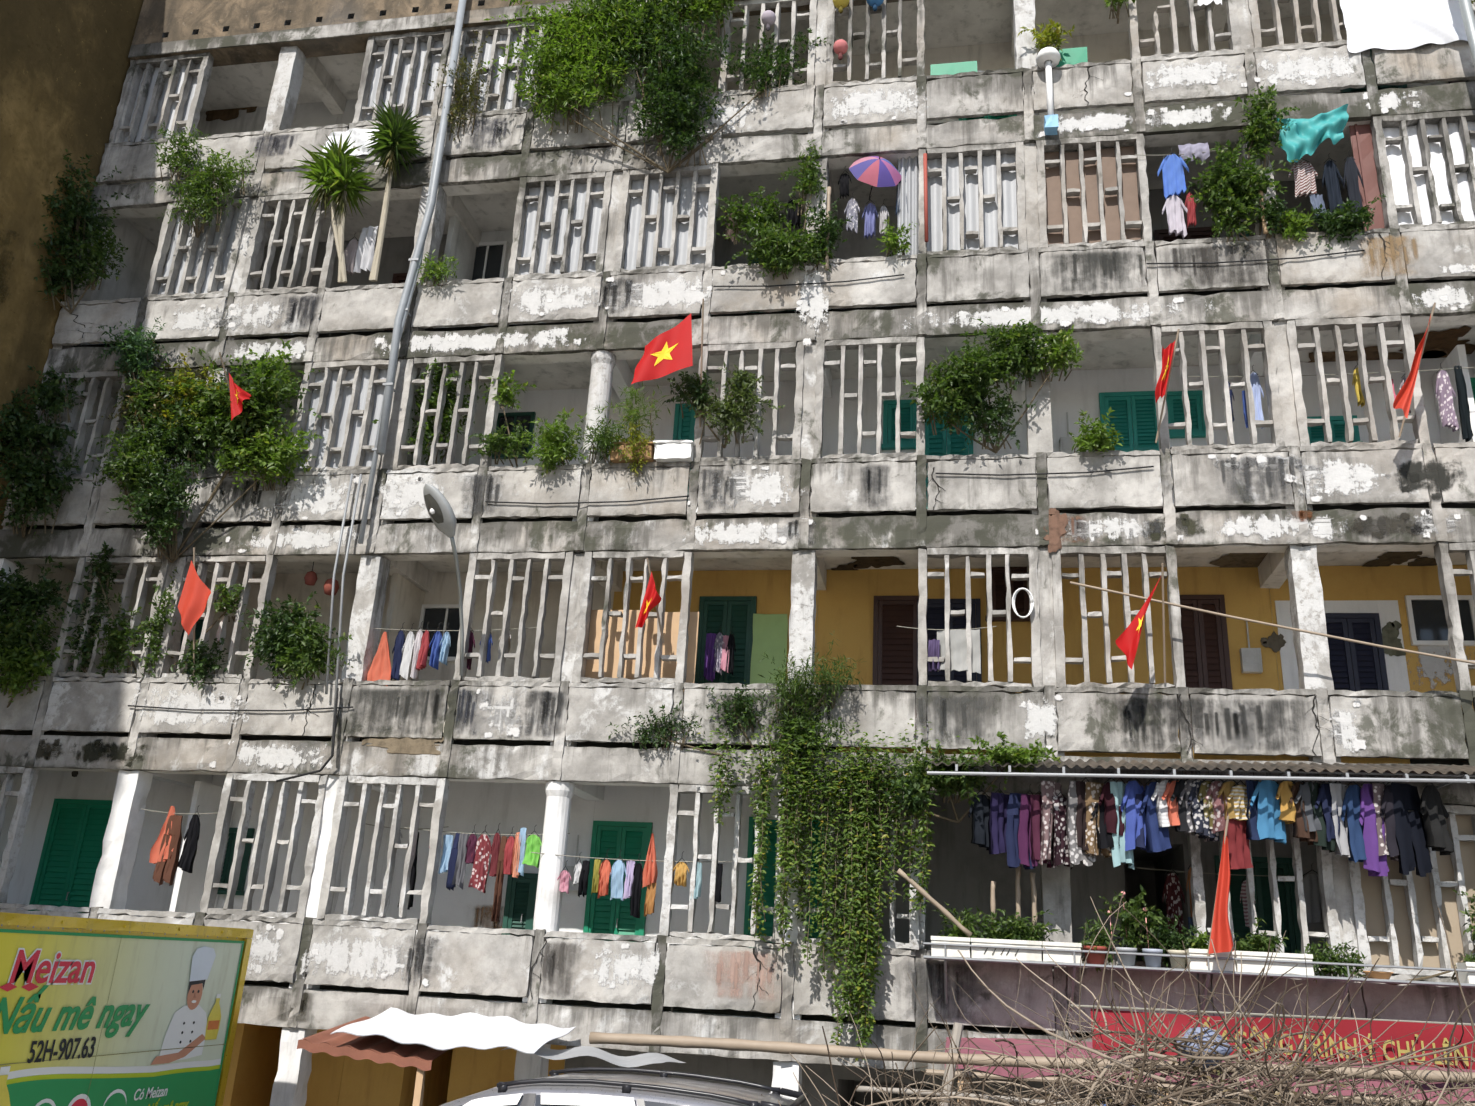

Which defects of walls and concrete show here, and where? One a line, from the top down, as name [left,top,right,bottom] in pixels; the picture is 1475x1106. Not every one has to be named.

peeling [375,271,726,354]
peeling [796,266,829,345]
spalling [1305,263,1475,363]
mould [1396,458,1463,500]
spalling [831,556,905,570]
peeling [1208,454,1386,568]
mould [1345,513,1434,539]
spalling [1363,509,1461,567]
mould [24,739,146,767]
damp [1119,699,1296,749]
crack [747,948,769,1012]